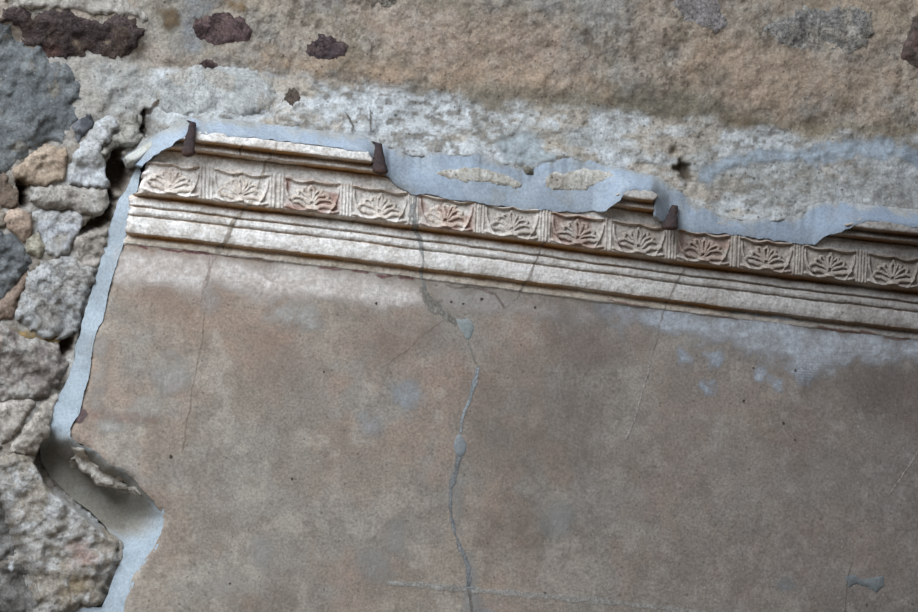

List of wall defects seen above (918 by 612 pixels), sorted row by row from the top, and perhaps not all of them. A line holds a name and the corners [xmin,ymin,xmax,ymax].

leakage [579,300,918,382]
crack [388,197,552,612]
spalling [69,447,141,495]